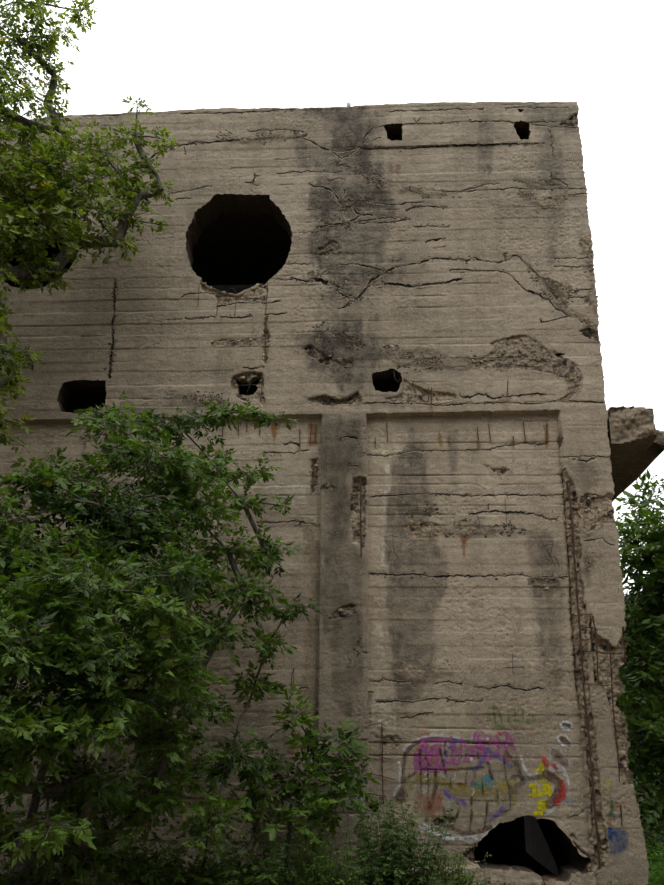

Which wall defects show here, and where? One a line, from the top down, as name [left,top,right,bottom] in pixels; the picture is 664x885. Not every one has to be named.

water stain [310,107,393,299]
crack [141,105,598,343]
spalling [167,280,272,413]
spalling [301,319,367,370]
crack [407,356,504,370]
spalling [380,334,584,405]
spalling [309,457,338,499]
spalling [348,475,368,557]
spalling [527,423,633,876]
spalling [460,842,480,869]